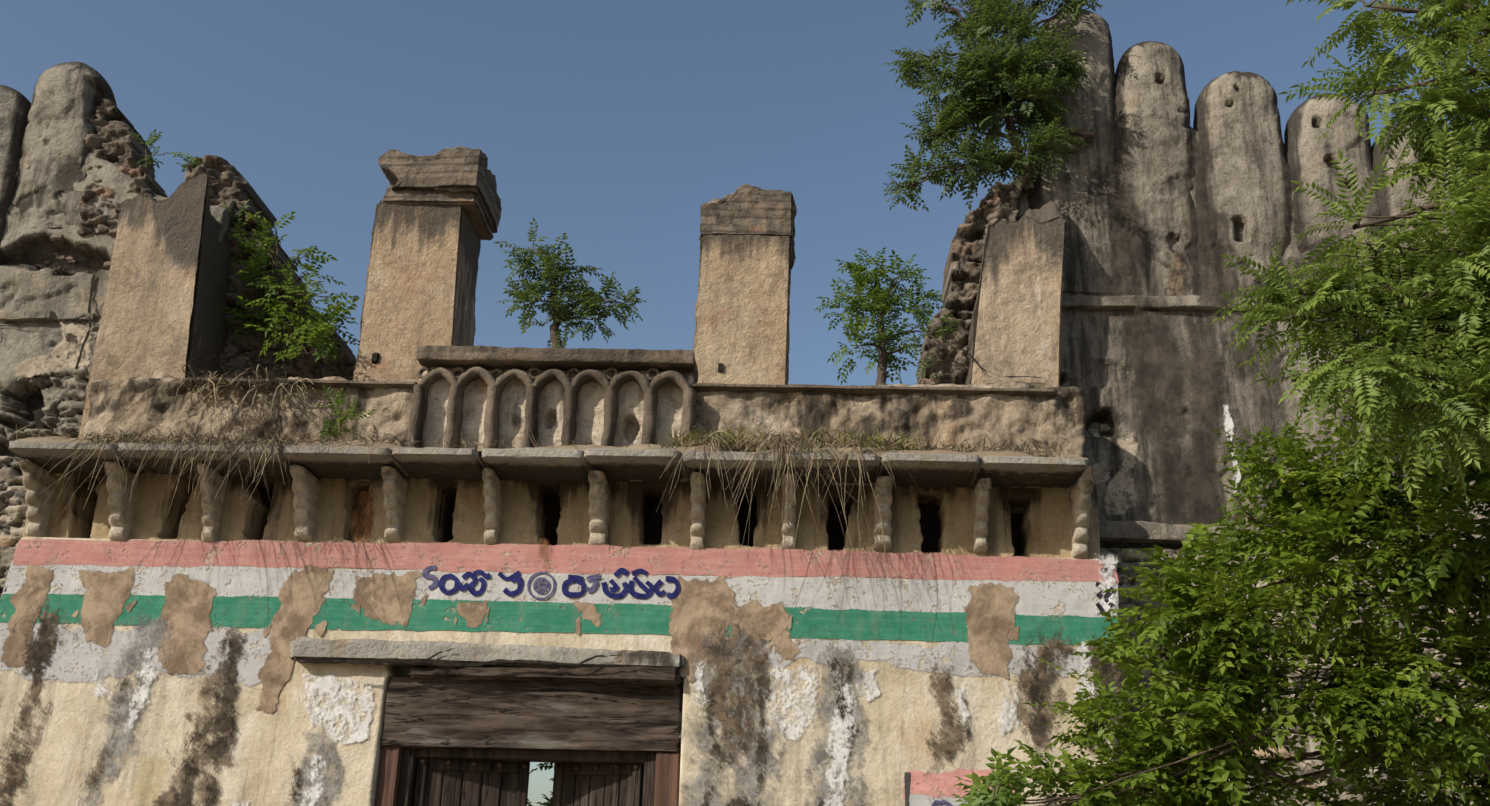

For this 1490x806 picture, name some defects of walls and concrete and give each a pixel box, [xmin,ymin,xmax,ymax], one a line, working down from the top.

water stain [0,599,70,806]
peeling [72,566,137,648]
peeling [156,573,216,675]
water stain [152,627,246,806]
peeling [255,565,333,713]
peeling [352,570,427,627]
water stain [679,624,787,806]
peeling [668,575,800,682]
water stain [804,646,877,806]
peeling [964,582,1019,679]
water stain [998,628,1132,754]
water stain [1095,555,1118,614]